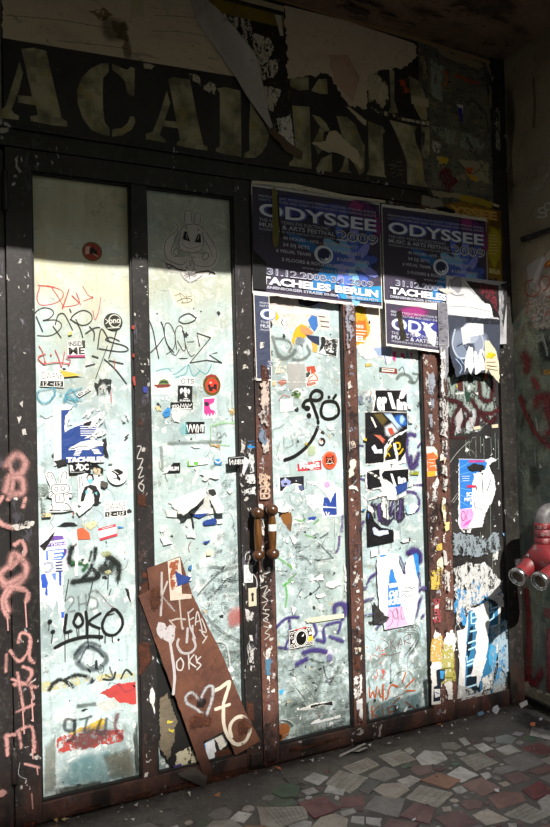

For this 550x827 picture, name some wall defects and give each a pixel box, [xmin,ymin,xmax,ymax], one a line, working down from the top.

rust [138,642,151,676]
rust [125,766,253,803]